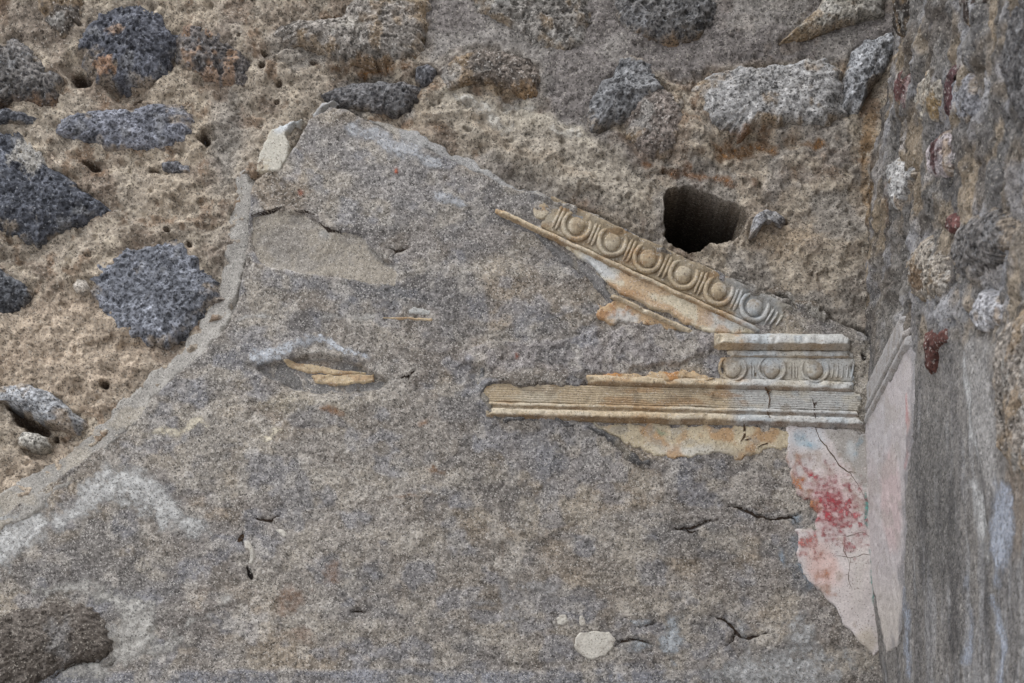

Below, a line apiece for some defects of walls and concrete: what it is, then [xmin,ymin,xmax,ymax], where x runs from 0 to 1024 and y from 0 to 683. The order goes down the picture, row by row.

spalling [68,70,95,89]
spalling [194,129,212,149]
peeling [256,100,339,175]
spalling [78,158,103,173]
spalling [251,206,397,286]
spalling [97,378,112,391]
spalling [260,359,387,394]
spalling [3,403,61,444]
crack [812,398,866,500]
crack [675,506,801,533]
crack [836,532,868,588]
crack [717,617,767,646]